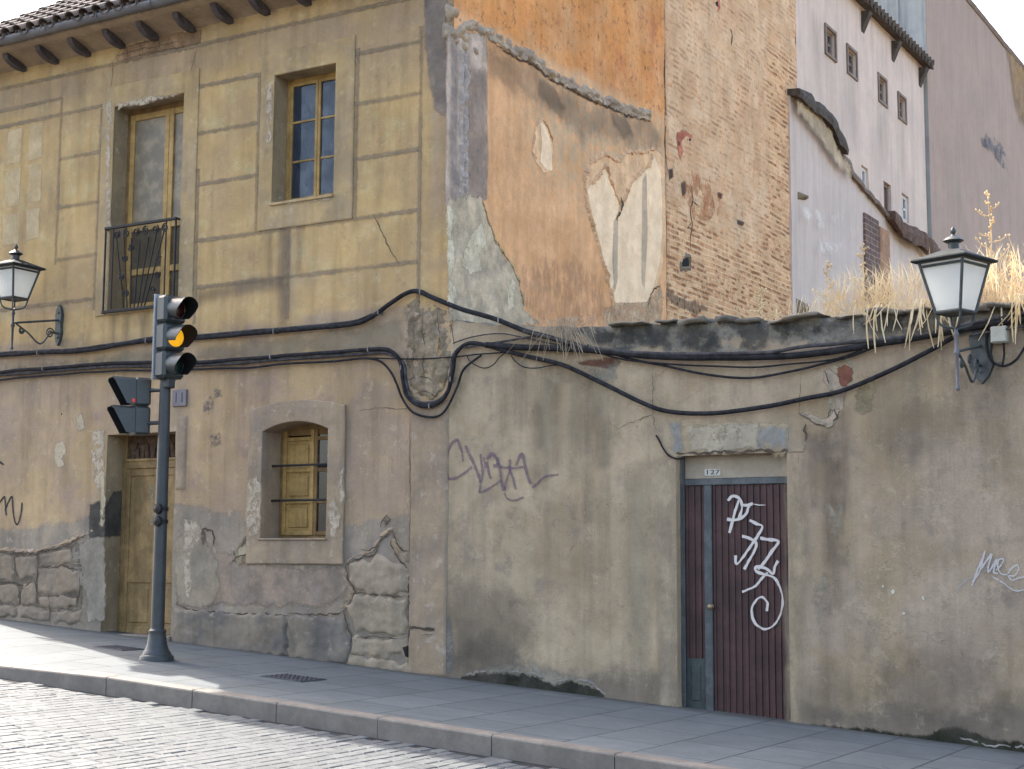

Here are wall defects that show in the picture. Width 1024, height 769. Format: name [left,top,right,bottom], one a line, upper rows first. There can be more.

peeling [531,116,553,173]
spalling [677,130,692,158]
peeling [582,145,723,334]
spalling [404,296,452,400]
spalling [798,359,876,441]
spalling [54,441,66,467]
peeling [76,413,106,526]
peeling [231,477,261,566]
peeling [327,469,345,537]